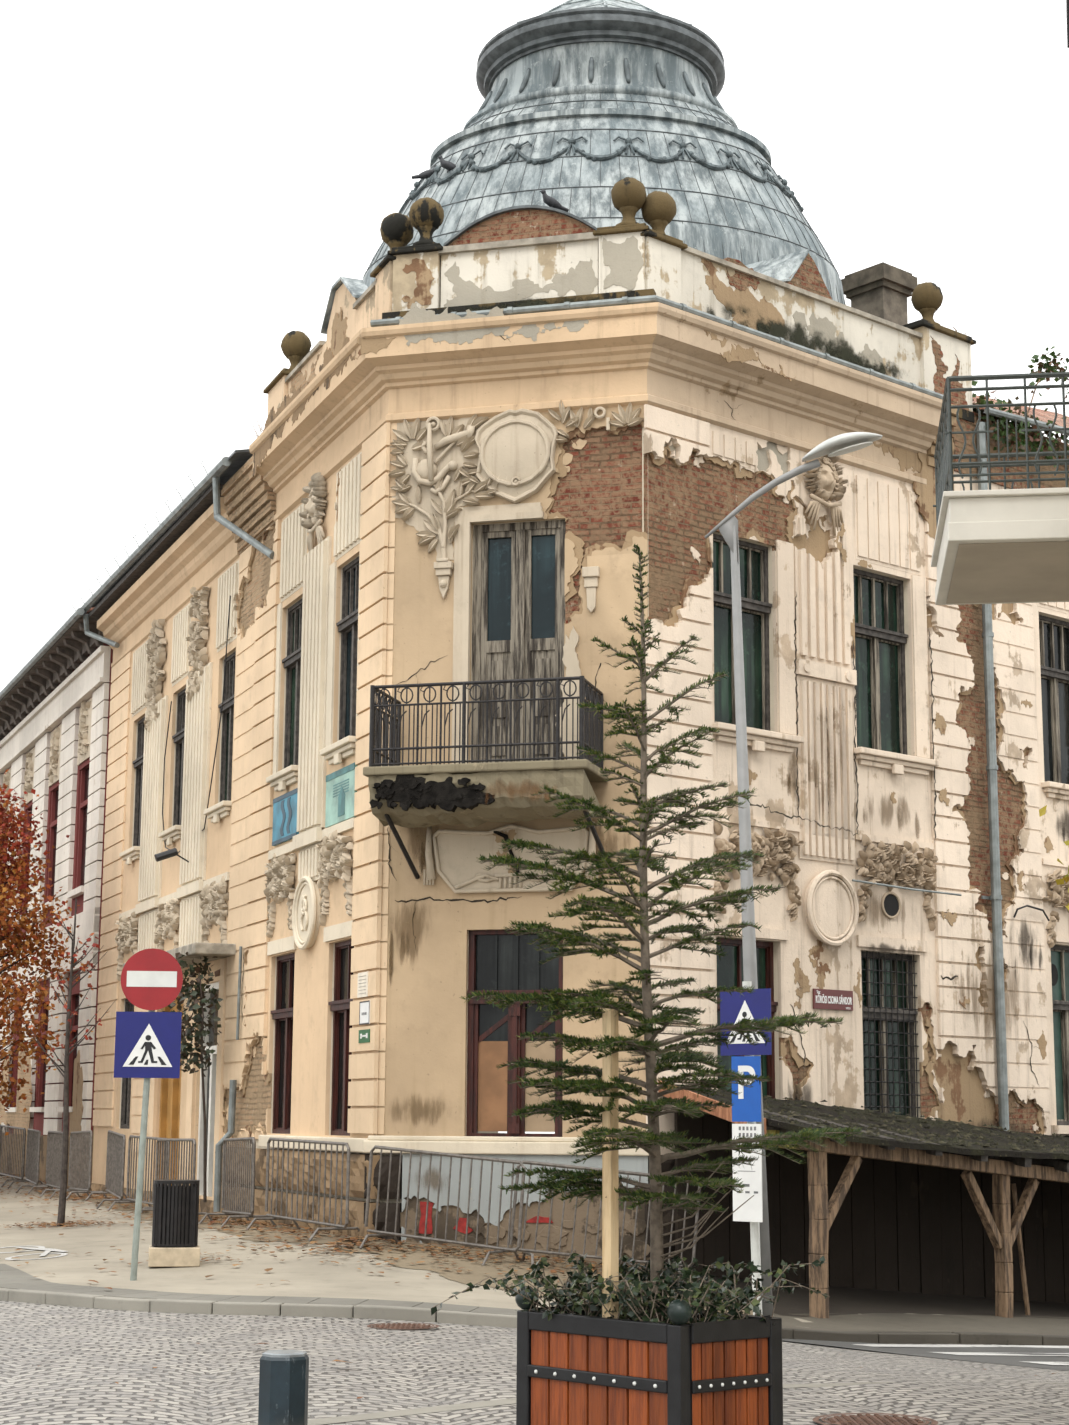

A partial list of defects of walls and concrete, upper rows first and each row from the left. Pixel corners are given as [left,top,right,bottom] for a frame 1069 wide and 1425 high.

peeling [402,236,644,309]
peeling [701,257,883,369]
flaking render [546,423,873,627]
flaking render [935,603,1029,933]
flaking render [959,948,983,1009]
flaking render [223,1036,272,1138]
flaking render [779,1035,813,1100]
flaking render [918,1002,1045,1134]
flaking render [1037,1030,1047,1059]